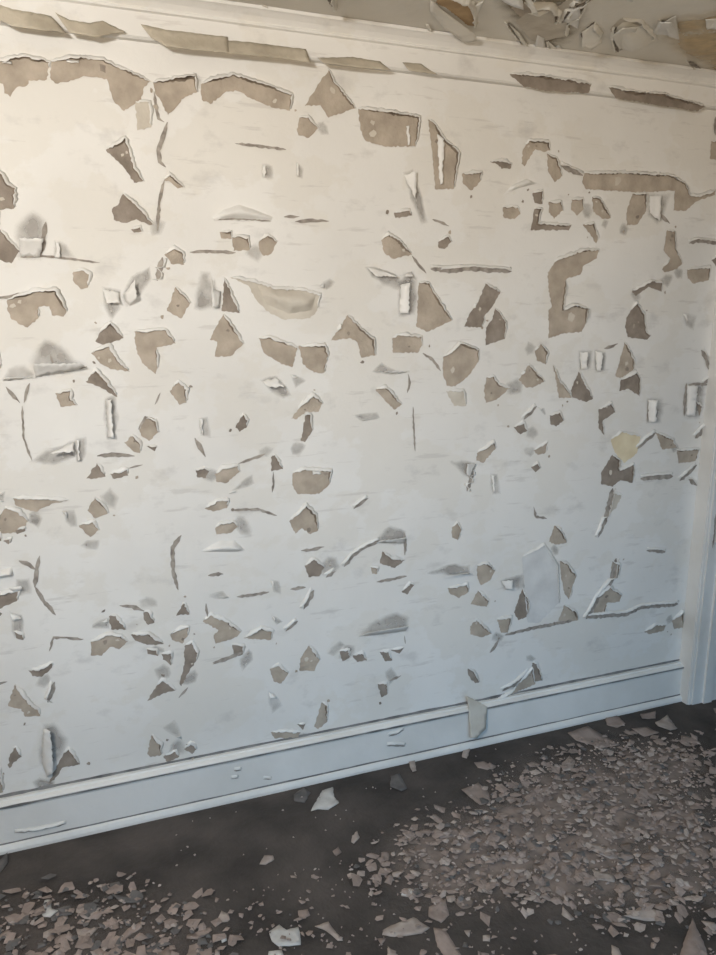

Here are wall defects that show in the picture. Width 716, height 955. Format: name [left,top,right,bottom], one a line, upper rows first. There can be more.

peeling [0,24,483,198]
peeling [510,71,592,93]
peeling [608,85,705,111]
peeling [0,170,18,210]
peeling [112,193,154,233]
peeling [0,244,244,438]
peeling [258,314,377,378]
peeling [368,230,453,353]
peeling [443,282,508,406]
peeling [484,138,716,487]
peeling [195,453,333,534]
peeling [90,596,200,701]